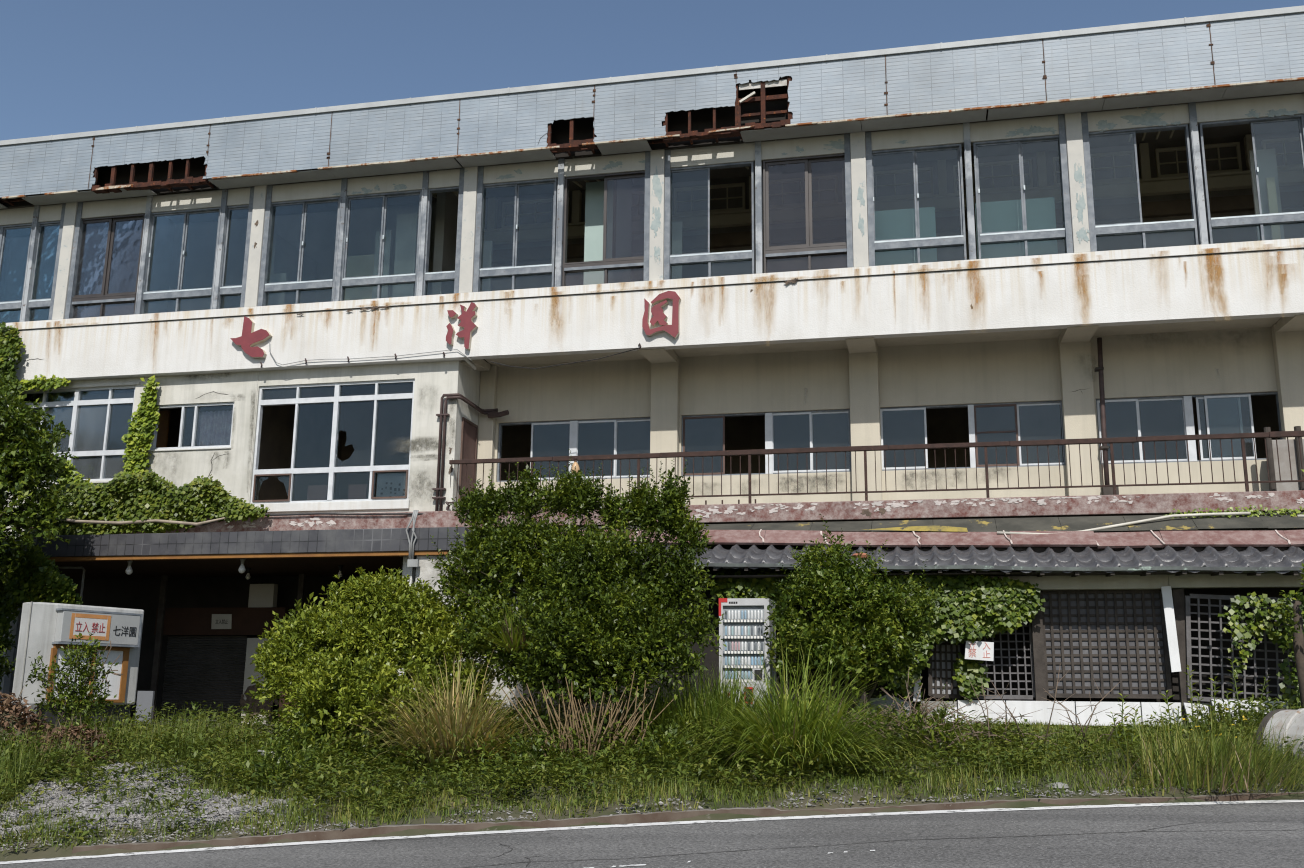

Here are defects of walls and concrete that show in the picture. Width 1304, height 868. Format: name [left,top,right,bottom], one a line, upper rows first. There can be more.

rust [958,261,980,304]
rust [1206,248,1222,292]